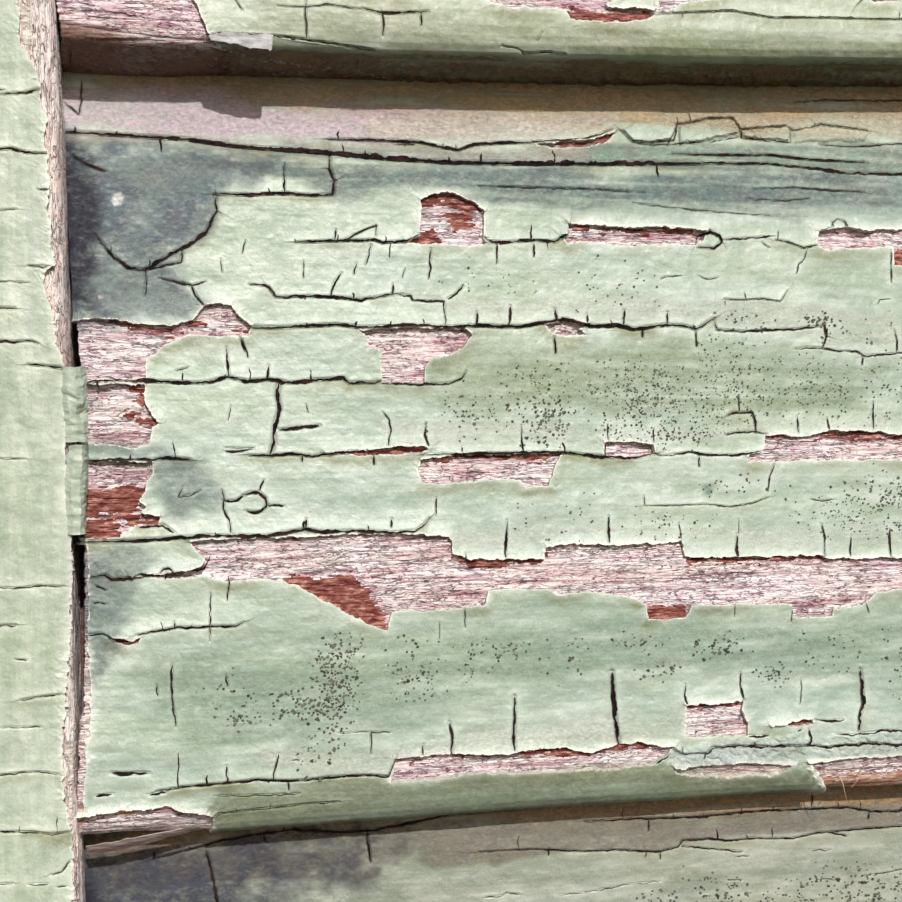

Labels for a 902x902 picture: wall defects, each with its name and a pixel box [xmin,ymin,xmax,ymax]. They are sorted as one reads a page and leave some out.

peeling [400,186,494,252]
crack [65,80,902,305]
leakage [69,141,901,323]
peeling [353,320,479,389]
crack [87,223,902,465]
peeling [10,0,420,902]
crack [421,398,775,507]
crack [86,480,429,604]
peeling [124,517,902,637]
peeling [381,675,902,792]
crack [656,670,902,764]
leakage [84,836,301,902]